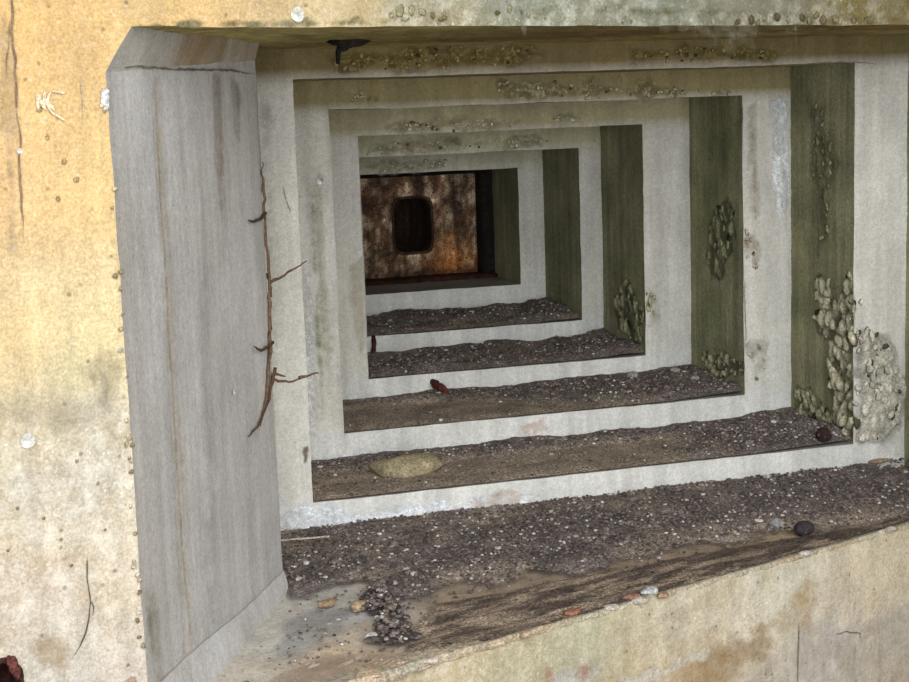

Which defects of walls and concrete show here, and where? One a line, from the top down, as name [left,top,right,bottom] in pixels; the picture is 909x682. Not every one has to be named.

crack [6,0,24,227]